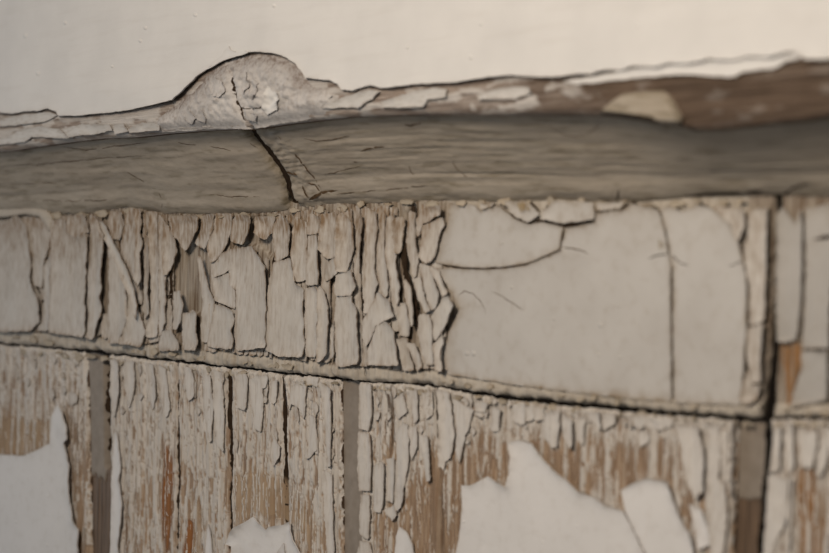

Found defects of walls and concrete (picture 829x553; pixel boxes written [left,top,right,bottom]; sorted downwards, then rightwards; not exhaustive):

peeling [0,0,829,145]
crack [15,143,144,202]
crack [231,77,422,212]
crack [167,268,175,326]
crack [401,233,420,329]
crack [443,247,588,270]
crack [503,183,811,379]
crack [800,235,829,350]
peeling [0,196,829,553]
crack [0,342,829,549]